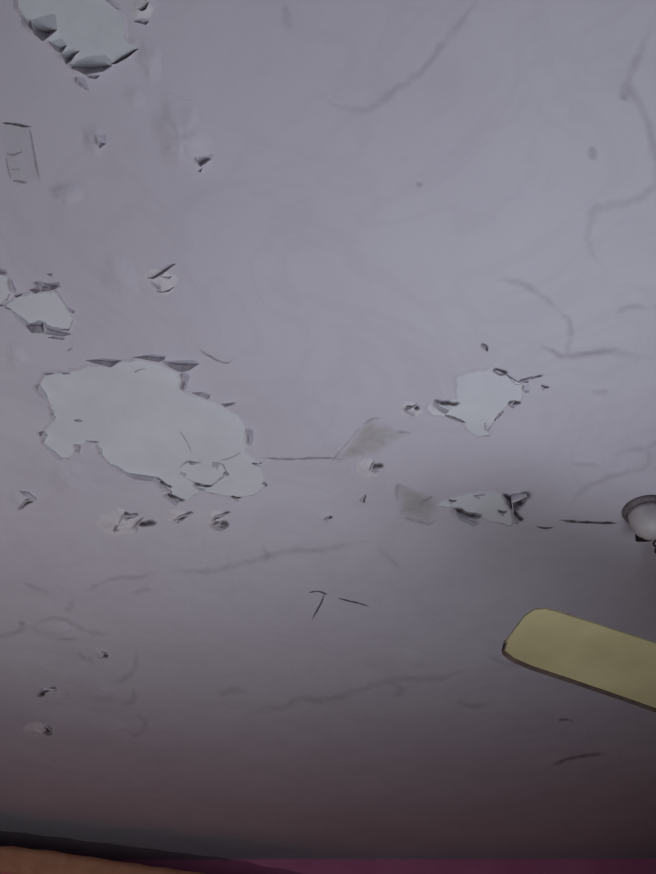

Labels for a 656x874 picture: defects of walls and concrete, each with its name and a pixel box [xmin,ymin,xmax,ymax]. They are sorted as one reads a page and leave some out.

peeling [13,0,154,92]
peeling [0,271,77,341]
peeling [144,264,178,296]
peeling [401,366,549,438]
peeling [36,356,268,524]
peeling [96,507,155,536]
peeling [205,510,230,532]
peeling [435,489,529,527]